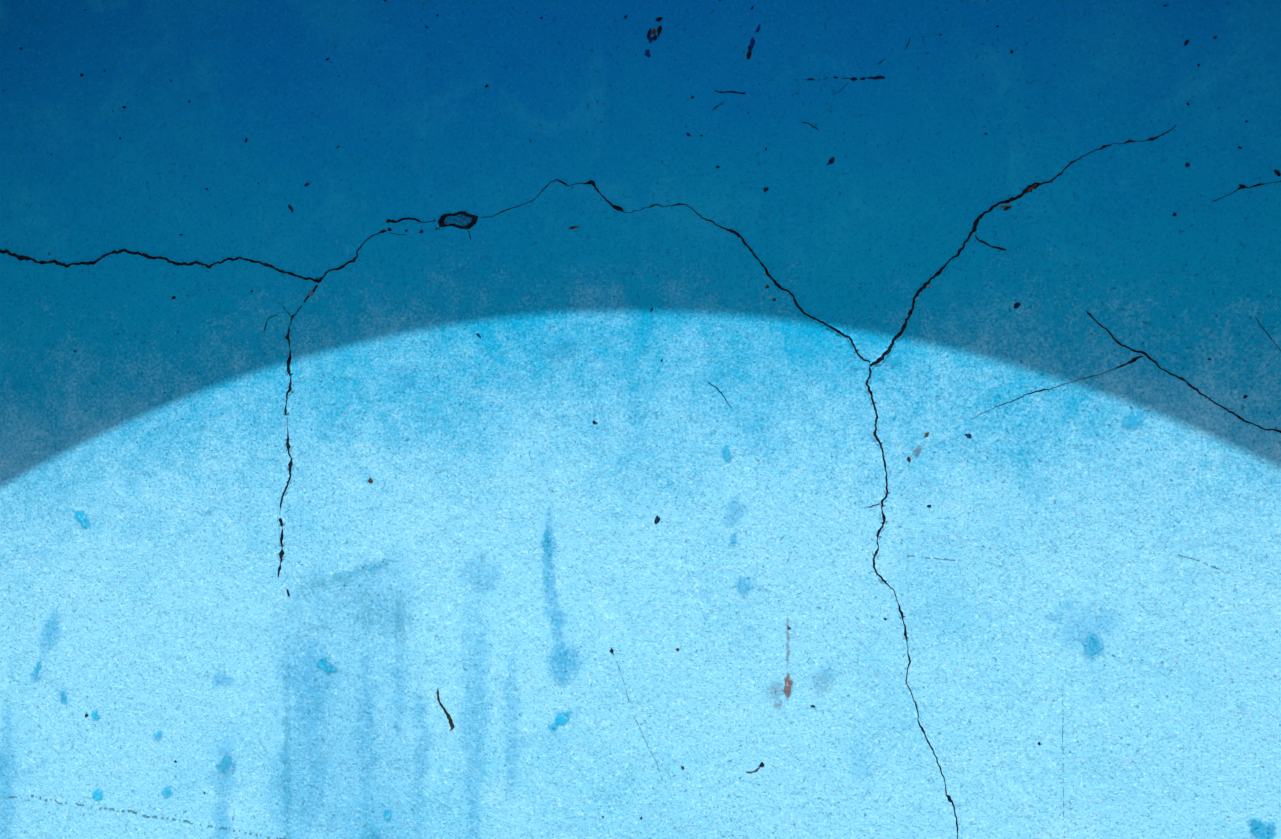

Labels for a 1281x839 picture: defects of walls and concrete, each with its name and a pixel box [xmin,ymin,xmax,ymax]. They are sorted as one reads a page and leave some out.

crack [1212,169,1281,202]
crack [0,215,436,577]
crack [974,311,1281,436]
crack [481,126,1176,839]
water stain [316,659,337,673]
water stain [550,712,569,730]
crack [10,794,291,839]